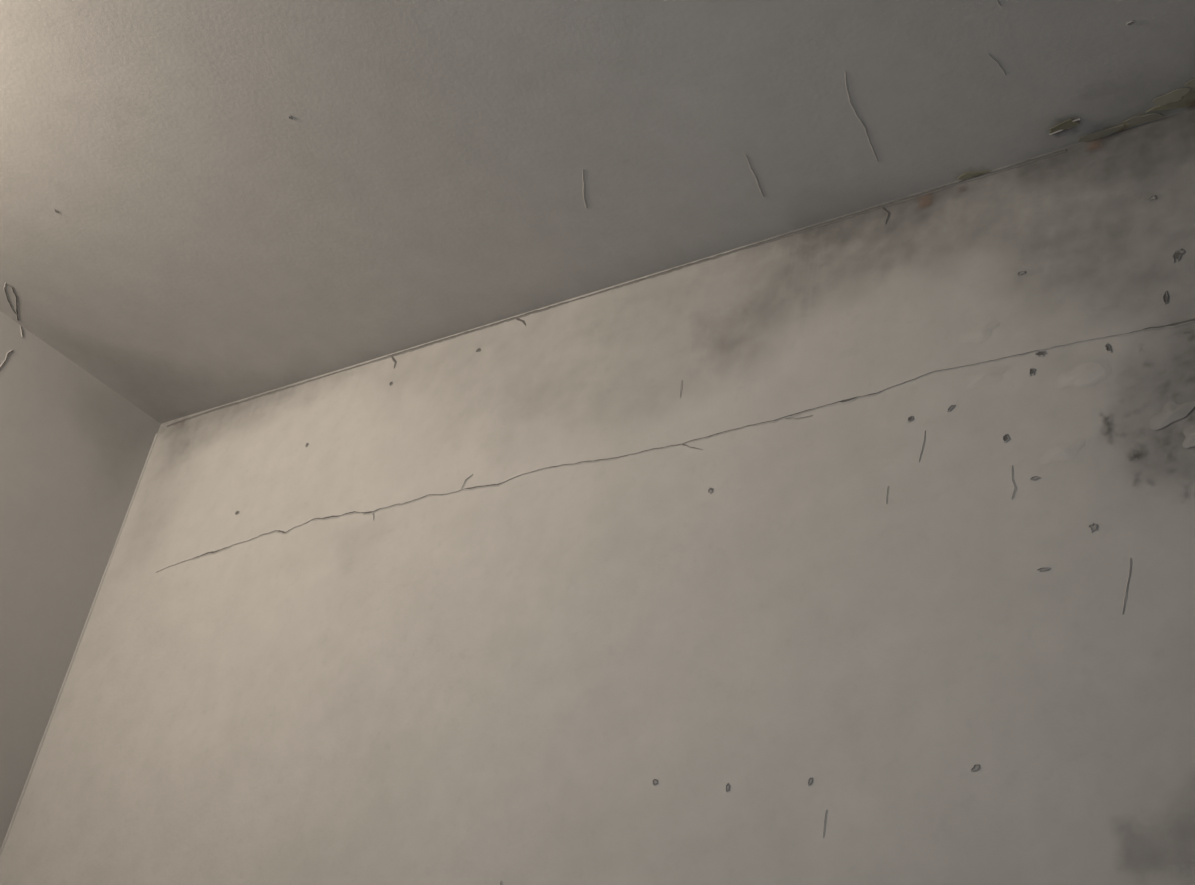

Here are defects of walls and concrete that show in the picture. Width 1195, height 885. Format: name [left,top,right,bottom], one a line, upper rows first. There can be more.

crack [845,72,879,162]
crack [0,282,23,370]
crack [155,318,1195,573]